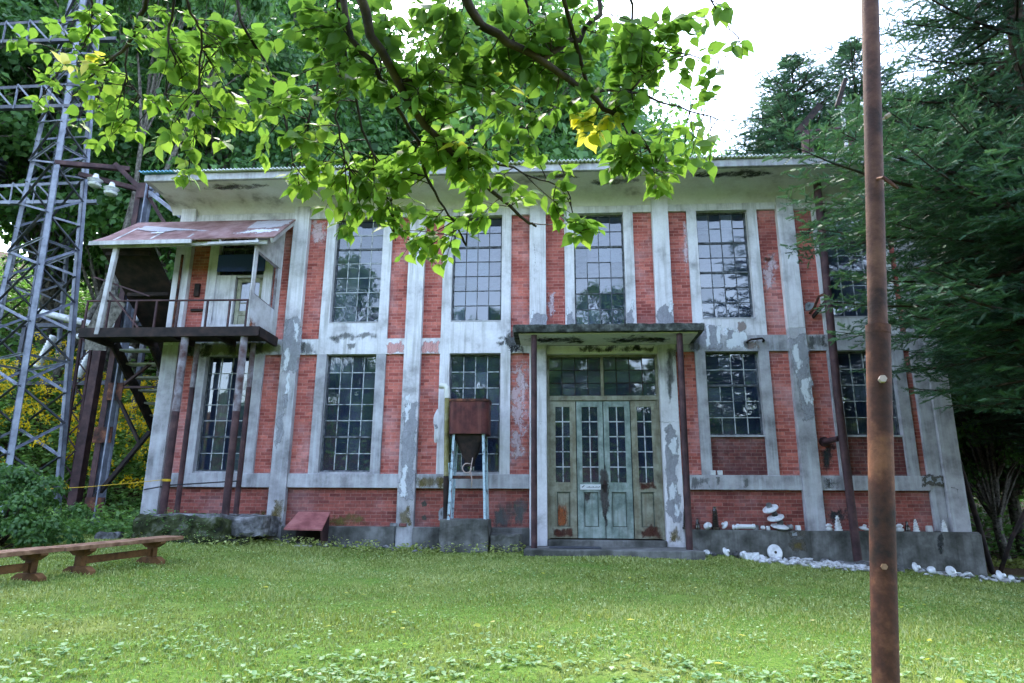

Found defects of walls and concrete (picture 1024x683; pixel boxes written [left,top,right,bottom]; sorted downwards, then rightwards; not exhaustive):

peeling [281,316,303,374]
leakage [496,333,676,462]
peeling [692,325,733,352]
peeling [789,333,815,421]
peeling [398,394,427,520]
peeling [664,423,682,523]
corrosion [554,506,573,537]